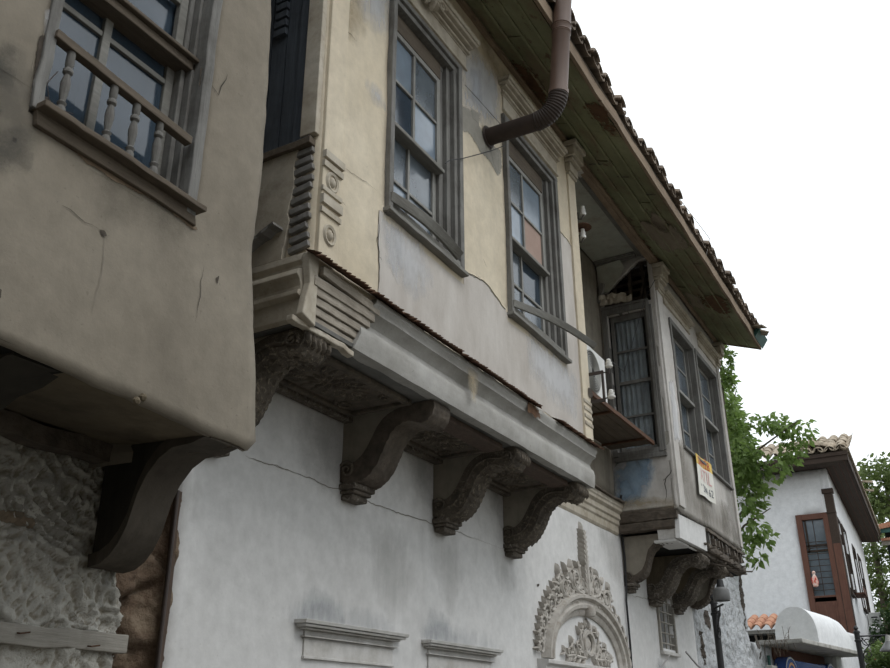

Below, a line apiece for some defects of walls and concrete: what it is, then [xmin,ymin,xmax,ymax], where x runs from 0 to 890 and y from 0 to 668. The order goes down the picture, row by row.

crack [249,458,339,489]